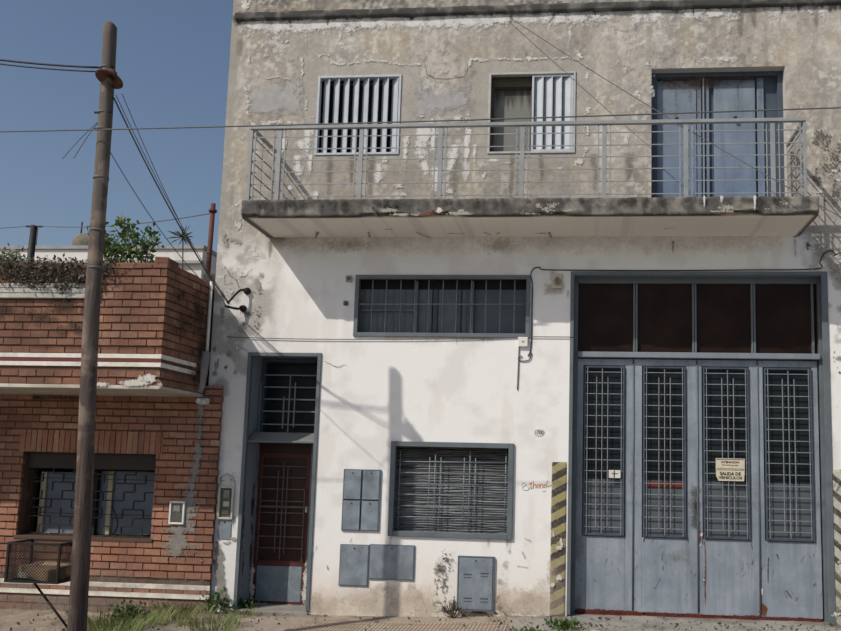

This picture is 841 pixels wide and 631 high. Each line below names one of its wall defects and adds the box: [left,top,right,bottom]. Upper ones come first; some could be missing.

peeling [468,53,589,84]
peeling [375,157,388,183]
peeling [403,82,476,194]
spalling [97,374,162,389]
corrosion [693,489,706,598]
corrosion [576,557,822,622]